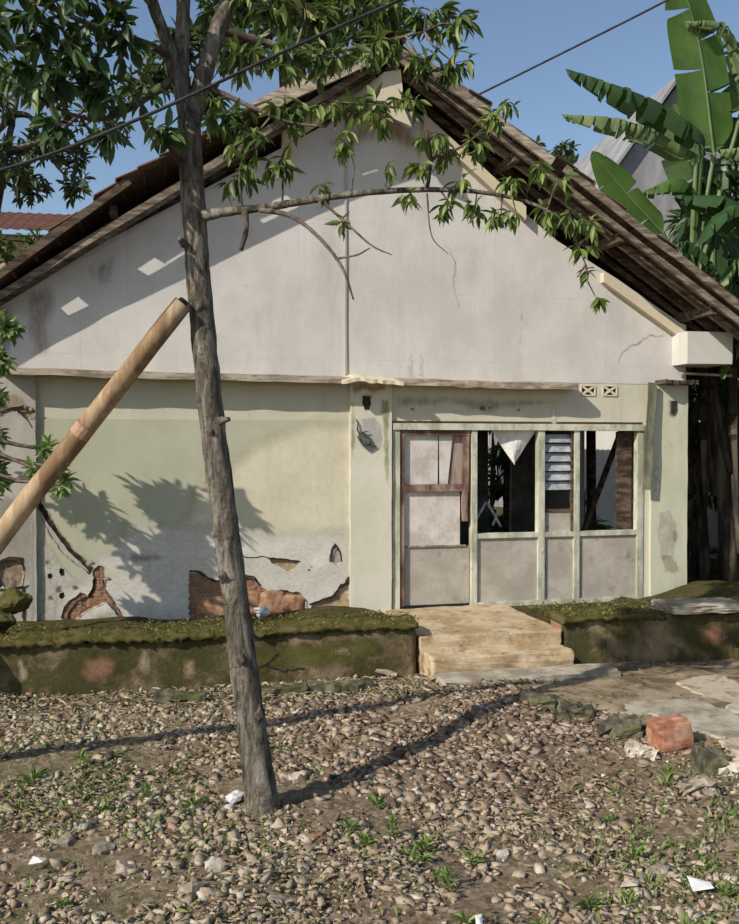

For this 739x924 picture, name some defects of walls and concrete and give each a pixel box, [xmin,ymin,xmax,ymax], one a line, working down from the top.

flaking render [40,542,81,620]
spalling [188,570,224,619]
peeling [268,557,300,572]
spalling [245,575,350,614]
peeling [329,544,342,565]
crack [258,654,304,673]